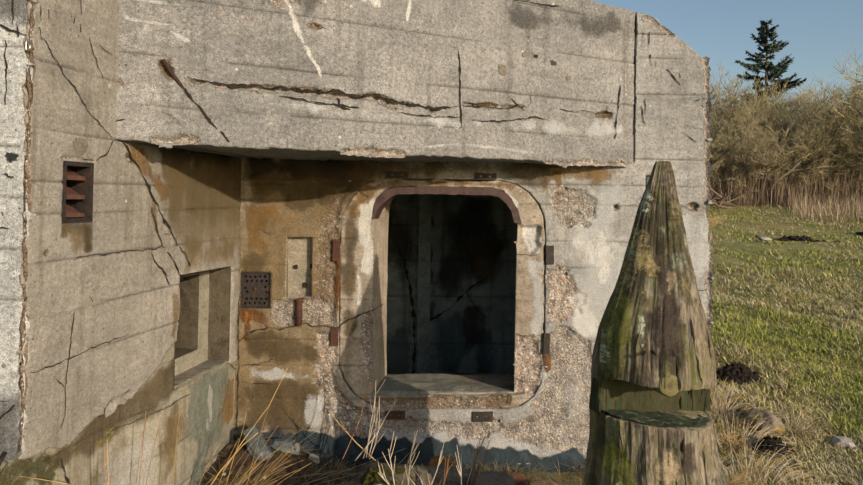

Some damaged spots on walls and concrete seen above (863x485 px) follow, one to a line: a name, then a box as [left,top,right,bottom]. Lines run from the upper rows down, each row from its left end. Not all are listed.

crack [0,0,191,285]
rust [161,59,185,89]
spalling [339,144,407,158]
crack [184,17,681,162]
rust [62,223,92,251]
spalling [548,185,598,229]
crack [30,297,128,428]
leakage [50,360,175,466]
rust [240,308,268,341]
crack [226,293,383,429]
spalling [269,194,592,458]
leakage [190,461,205,485]